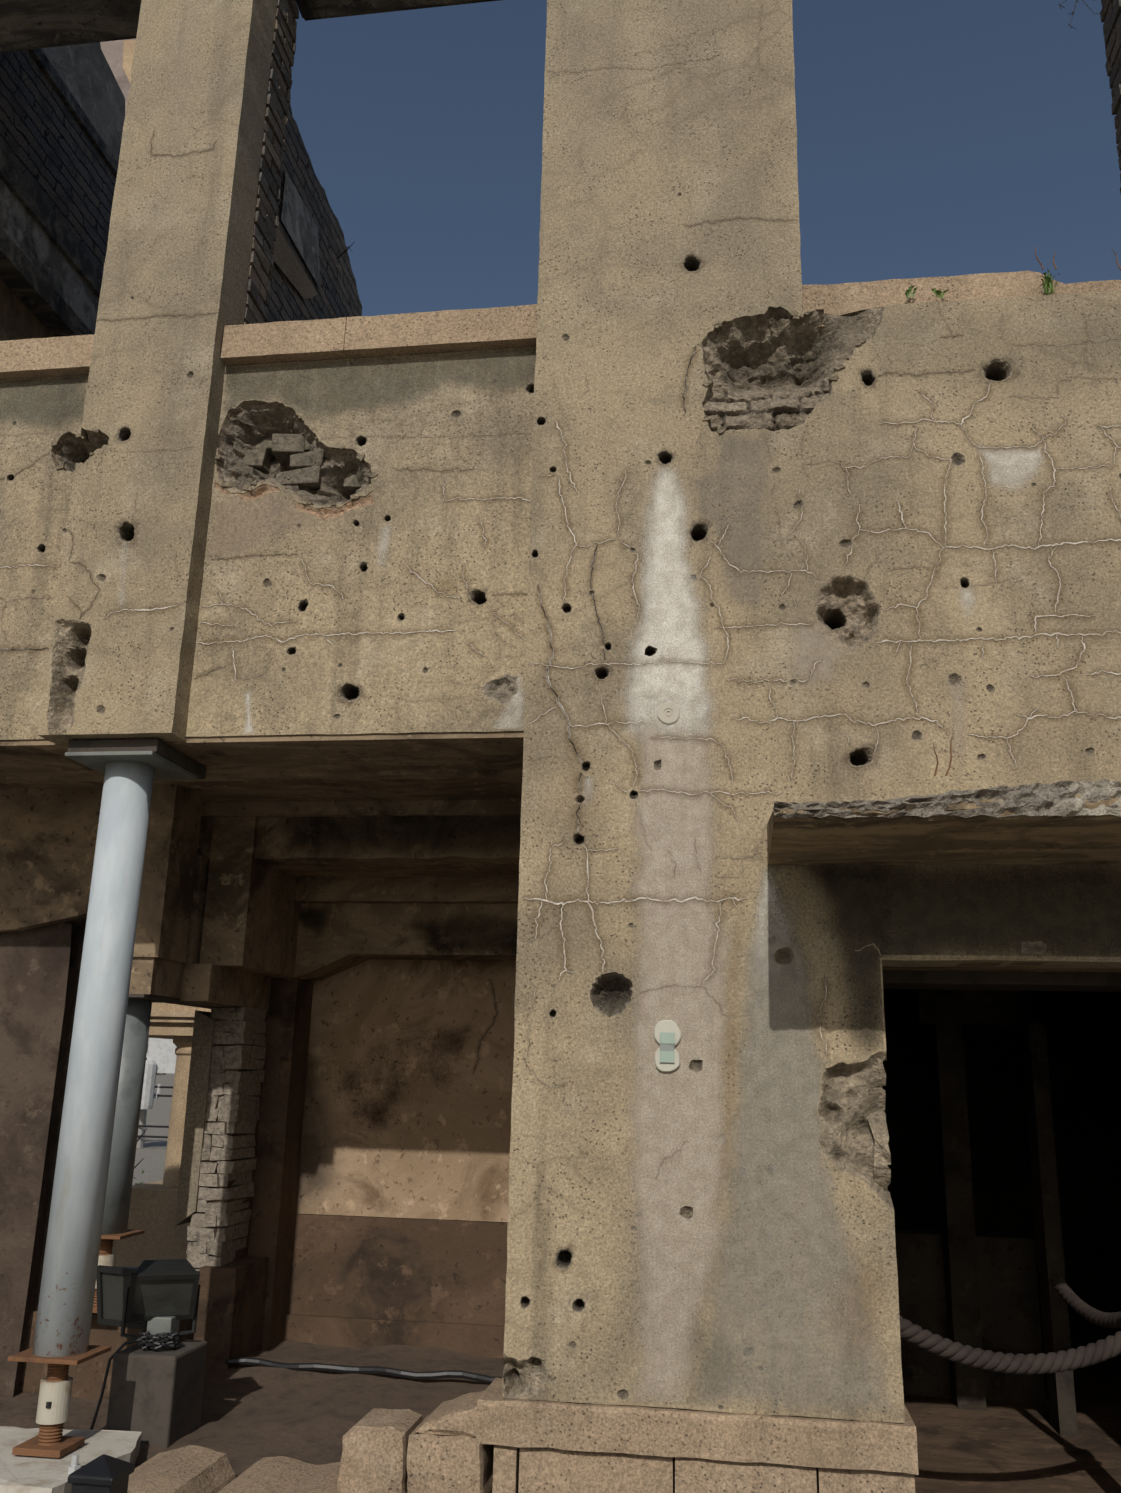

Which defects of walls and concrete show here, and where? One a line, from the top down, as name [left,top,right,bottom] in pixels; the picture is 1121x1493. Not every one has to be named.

peeling [829,338,866,382]
spalling [51,427,109,473]
spalling [215,400,378,528]
spalling [47,619,93,740]
crack [0,306,1121,1088]
spalling [948,673,962,686]
spalling [773,779,1121,819]
water stain [629,471,866,1396]
spalling [817,1051,894,1209]